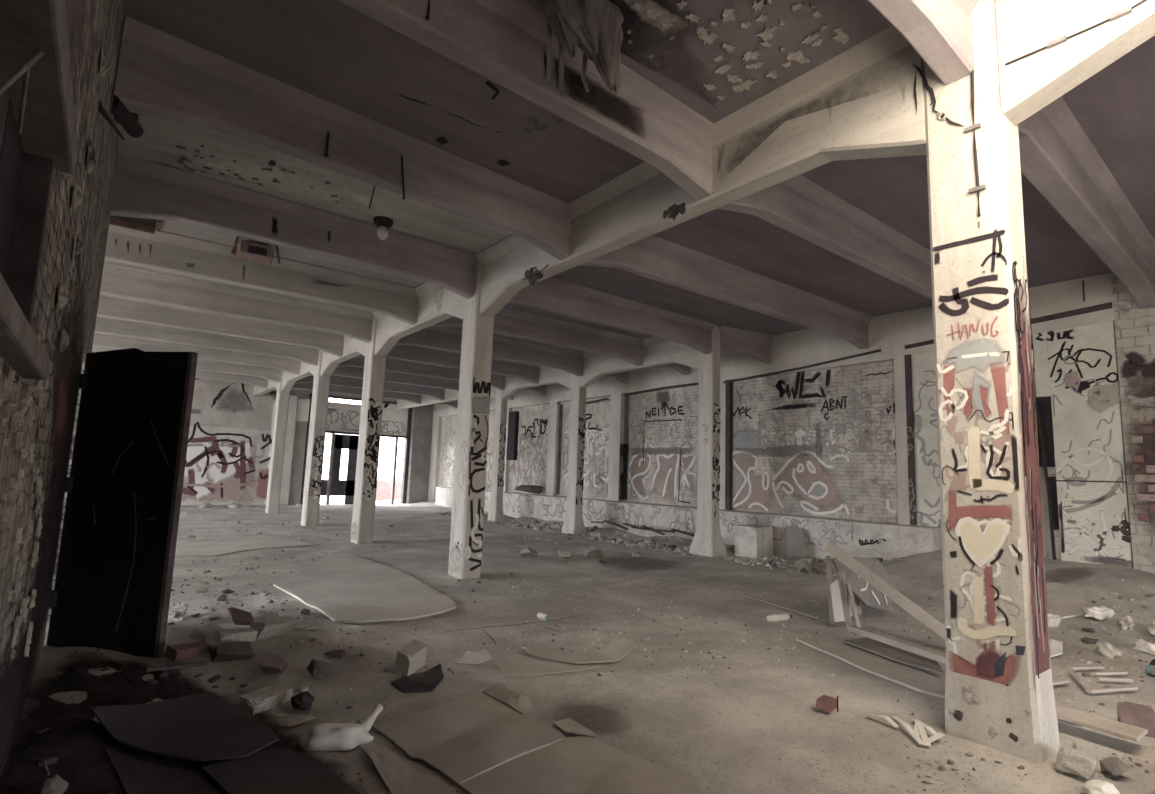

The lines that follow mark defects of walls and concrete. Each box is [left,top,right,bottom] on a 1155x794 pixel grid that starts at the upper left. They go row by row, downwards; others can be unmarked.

damp [631,27,712,103]
peeling [628,0,849,101]
crack [912,63,965,127]
peeling [176,145,346,203]
spalling [1111,367,1155,543]
peeling [0,370,44,659]